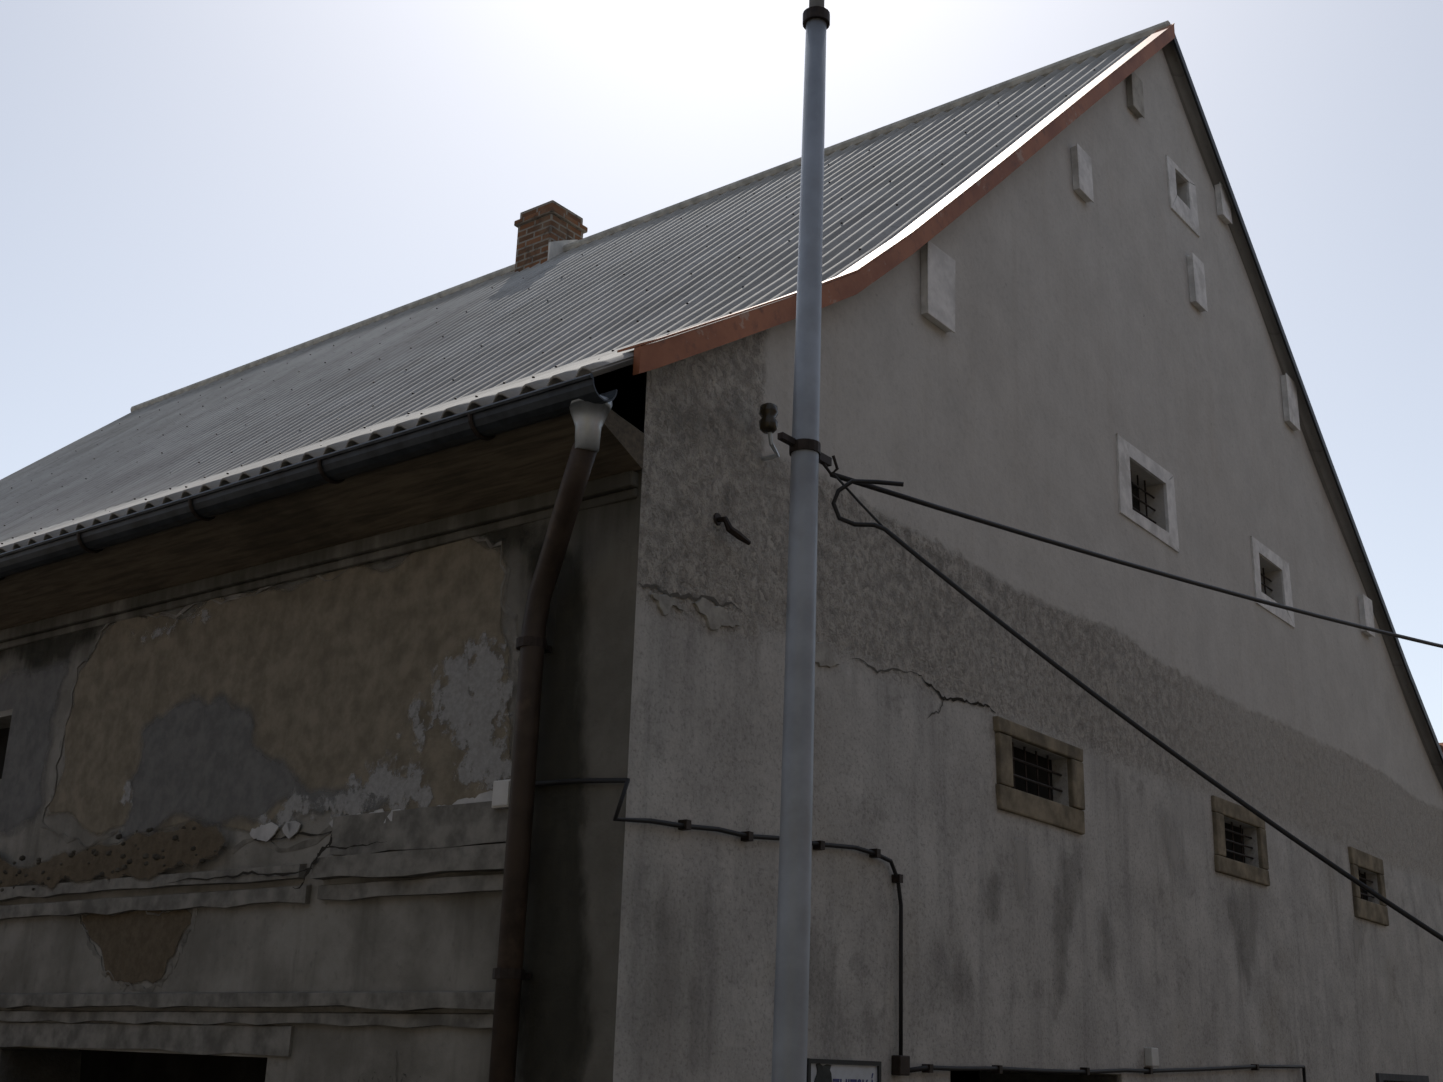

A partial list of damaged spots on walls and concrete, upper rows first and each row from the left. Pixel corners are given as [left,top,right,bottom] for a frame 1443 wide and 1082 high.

spalling [41,536,520,854]
crack [852,658,996,719]
spalling [77,908,198,993]